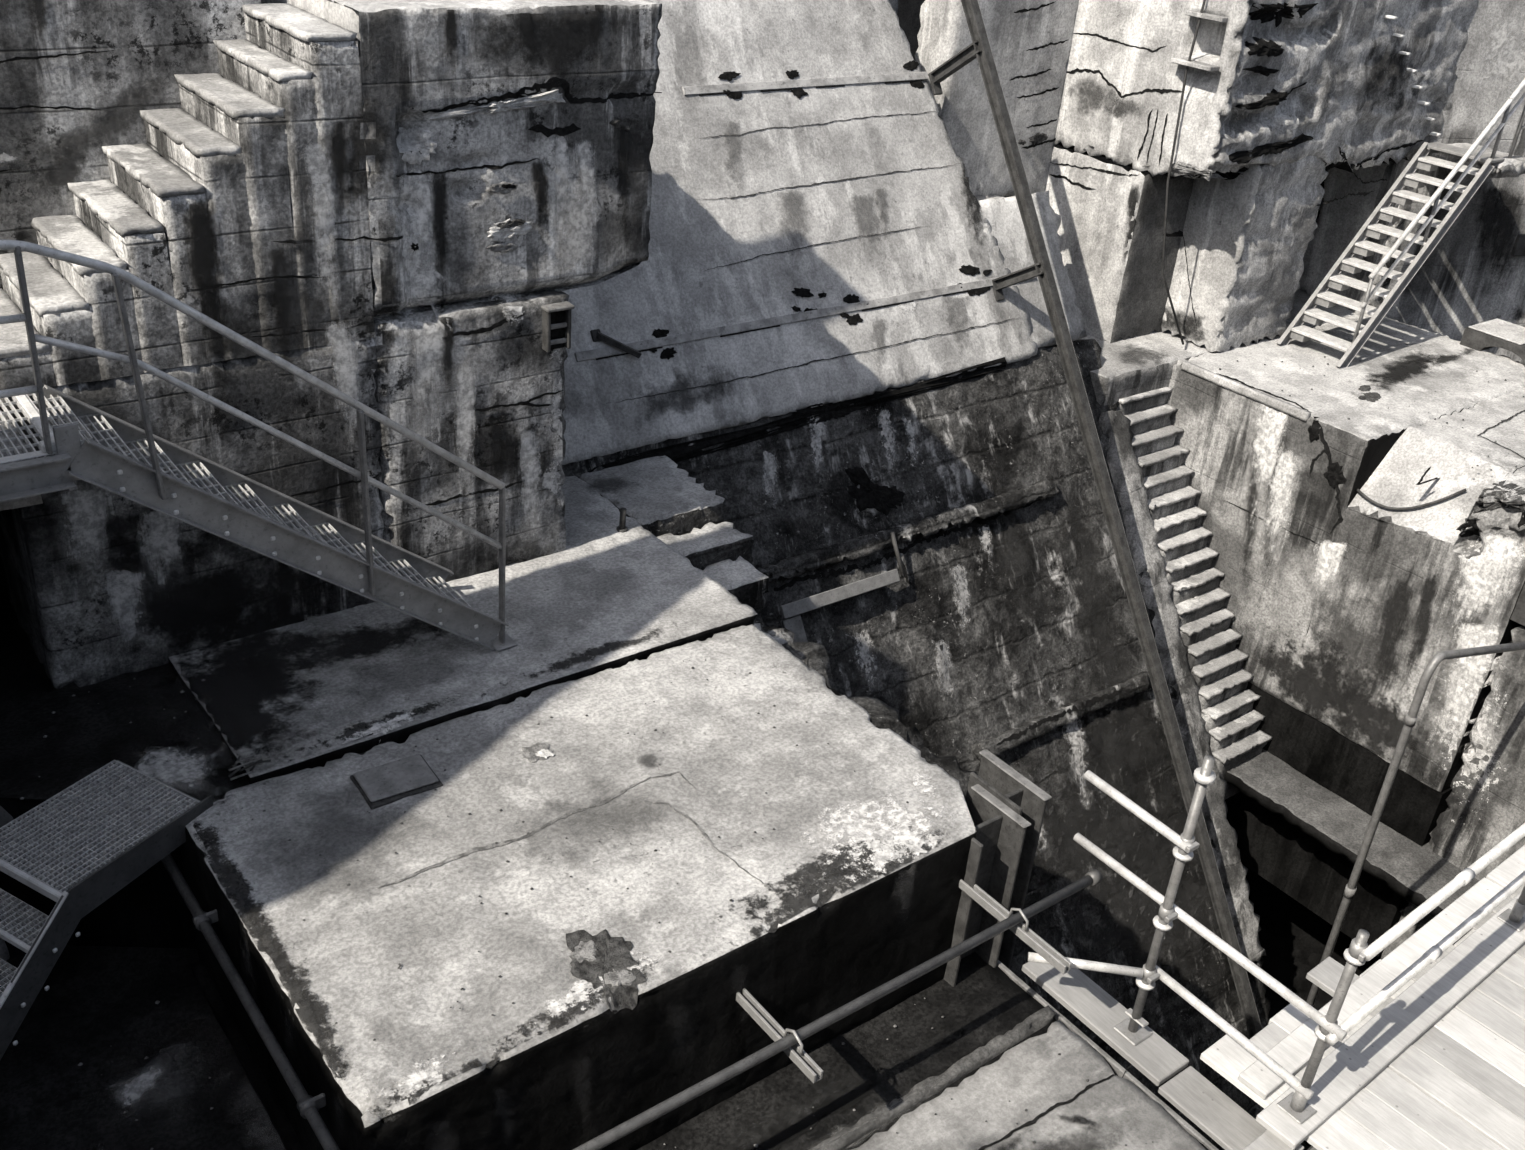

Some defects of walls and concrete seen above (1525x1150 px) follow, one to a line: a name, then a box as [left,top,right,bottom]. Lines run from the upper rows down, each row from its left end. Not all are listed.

crack [1009,1,1182,190]
crack [699,111,935,139]
crack [699,164,955,200]
spalling [486,219,532,253]
water stain [272,104,539,536]
efflorescence [879,410,918,465]
crack [1216,373,1347,559]
spalling [1456,480,1525,538]
efflorescence [952,566,970,621]
water stain [936,641,952,692]
crack [377,771,778,894]
spalling [529,929,664,1029]